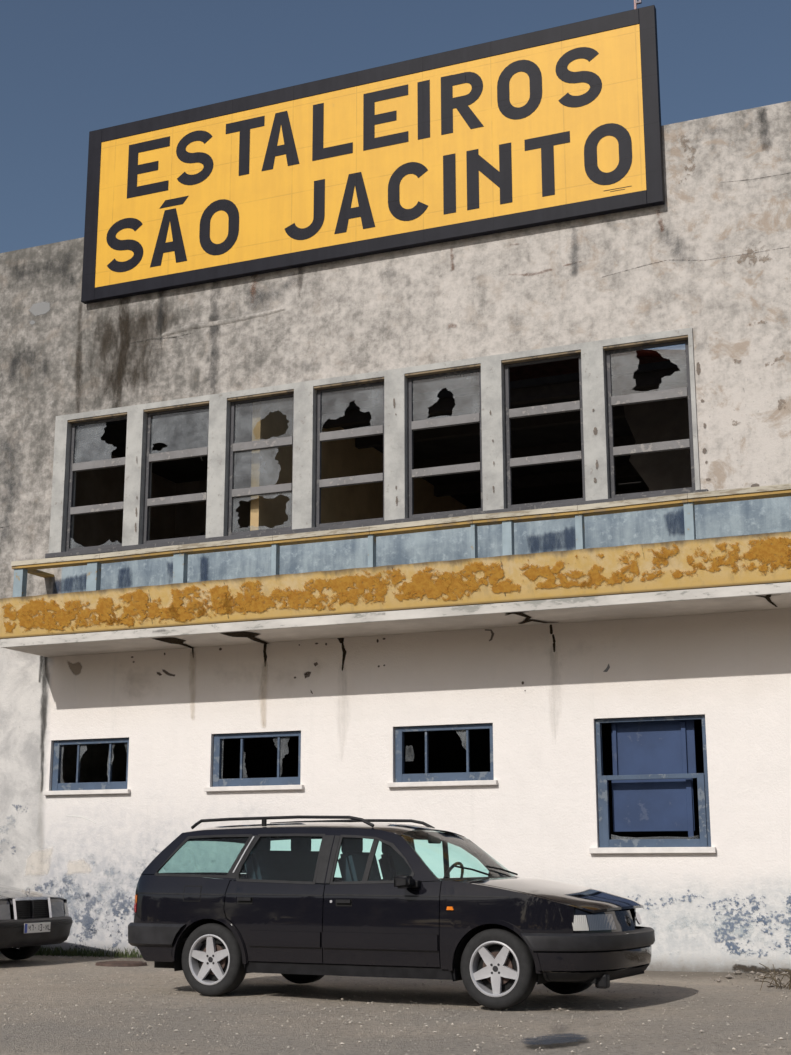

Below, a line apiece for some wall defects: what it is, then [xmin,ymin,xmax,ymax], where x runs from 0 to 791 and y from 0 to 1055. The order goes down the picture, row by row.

damp [100,292,167,408]
peeling [2,537,791,633]
crack [150,599,194,658]
crack [220,617,269,666]
crack [337,638,346,671]
crack [504,592,559,652]
damp [39,656,47,791]
peeling [34,876,139,951]
peeling [628,890,791,958]